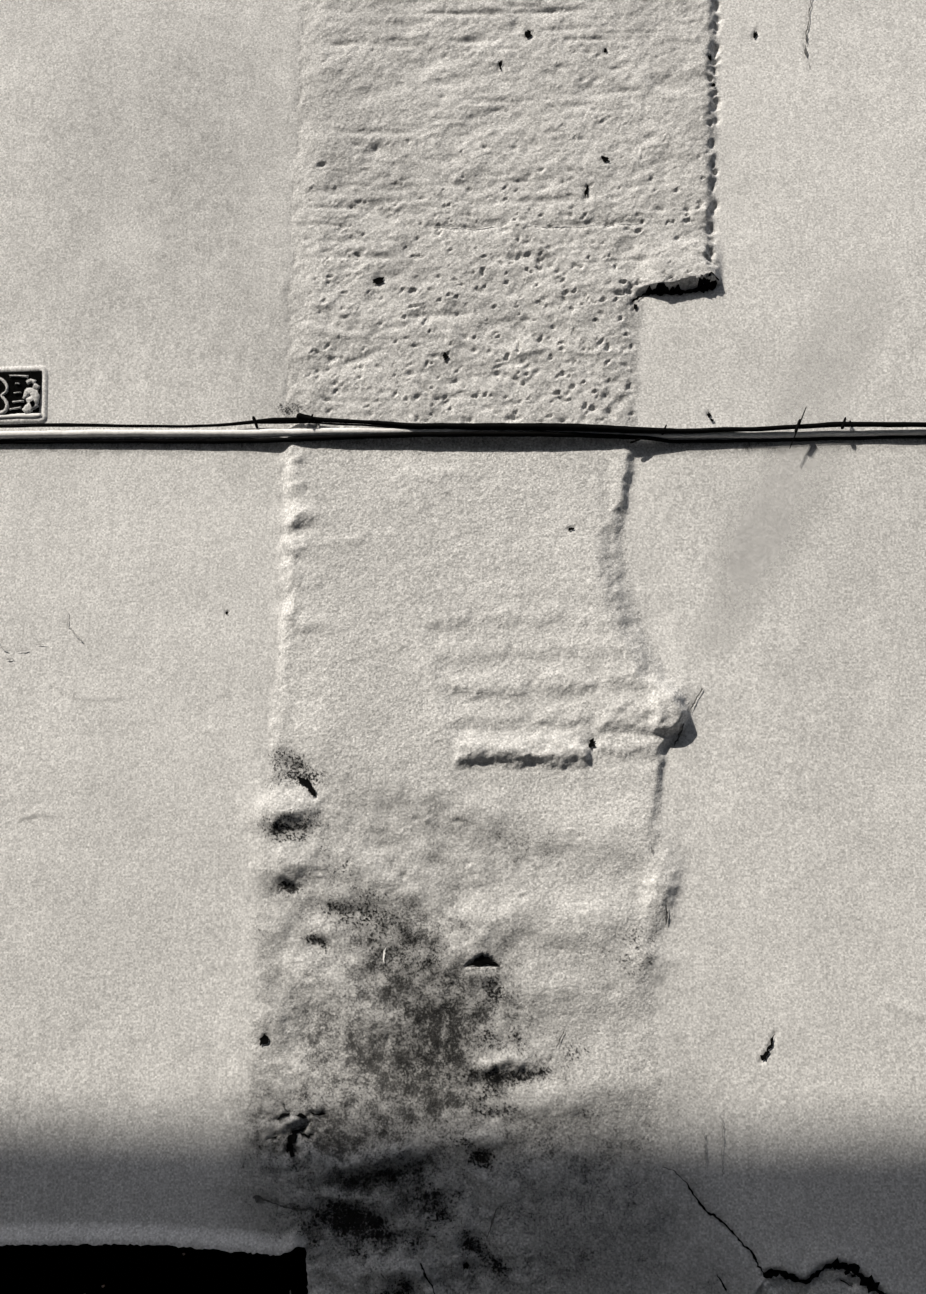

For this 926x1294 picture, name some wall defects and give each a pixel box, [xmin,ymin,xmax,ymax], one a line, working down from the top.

water stain [265,747,325,789]
spalling [415,595,670,772]
water stain [252,808,551,1145]
water stain [262,1129,512,1294]
crack [664,1117,885,1294]
spalling [756,1269,878,1294]